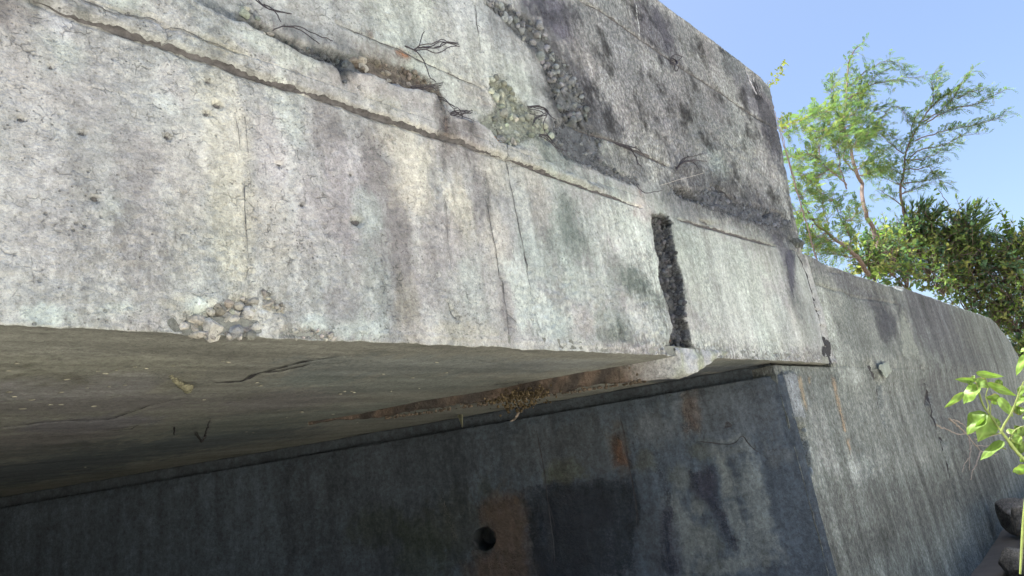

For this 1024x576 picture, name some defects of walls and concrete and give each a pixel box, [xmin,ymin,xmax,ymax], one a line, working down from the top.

crack [33,0,639,294]
spalling [486,0,638,186]
water stain [746,71,782,154]
spalling [178,289,284,343]
crack [220,356,341,383]
crack [485,199,516,330]
spalling [301,215,728,425]